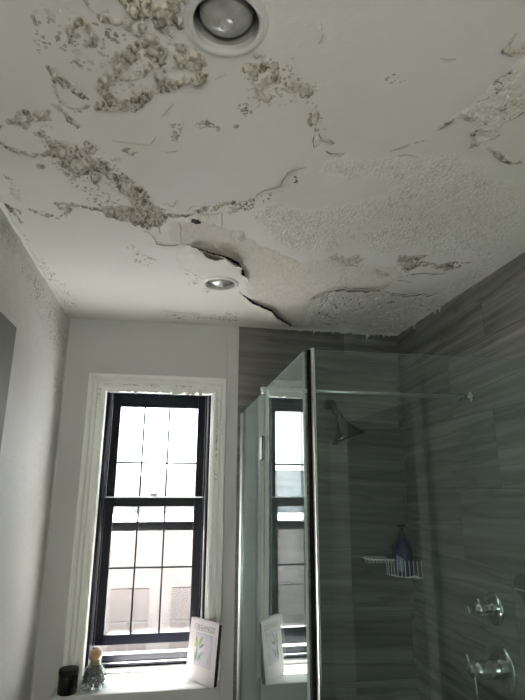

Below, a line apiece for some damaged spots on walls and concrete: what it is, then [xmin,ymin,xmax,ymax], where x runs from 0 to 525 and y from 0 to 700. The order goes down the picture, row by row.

flaking render [30,0,209,113]
peeling [437,32,525,165]
crack [166,167,306,229]
flaking render [168,216,447,333]